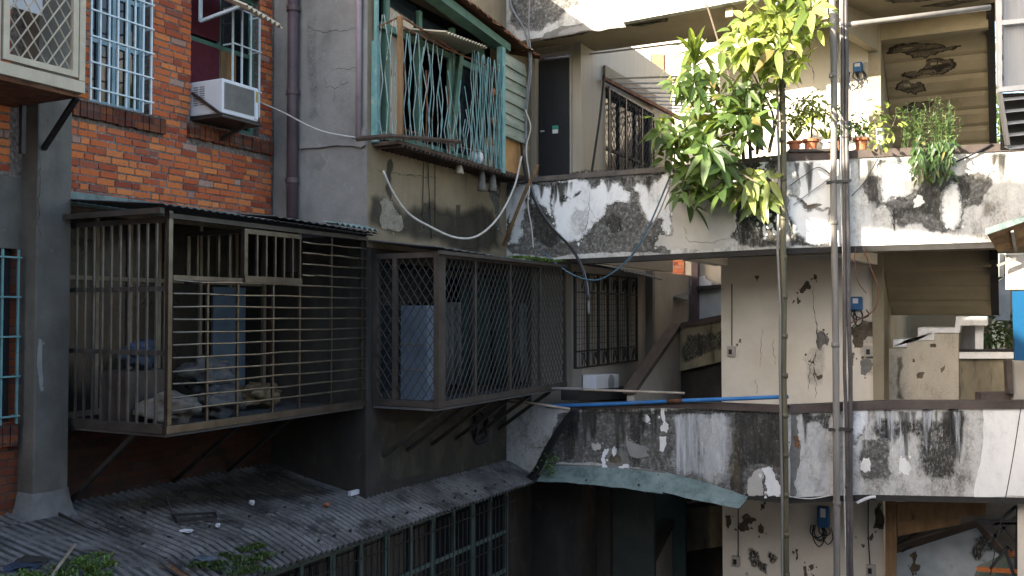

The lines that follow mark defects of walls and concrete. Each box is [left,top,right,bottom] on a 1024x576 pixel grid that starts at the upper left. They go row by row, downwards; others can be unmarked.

spalling [886,42,961,112]
peeling [379,198,403,236]
leakage [370,159,671,258]
peeling [506,171,737,251]
peeling [875,161,925,208]
peeling [939,181,964,233]
crack [808,292,827,398]
peeling [851,320,873,379]
leakage [548,409,780,495]
peeling [725,413,801,538]
leakage [859,409,964,479]